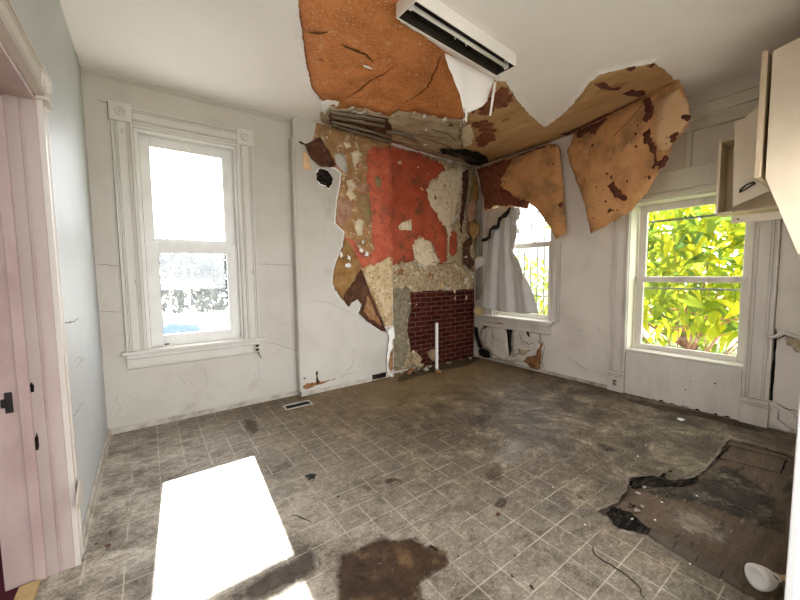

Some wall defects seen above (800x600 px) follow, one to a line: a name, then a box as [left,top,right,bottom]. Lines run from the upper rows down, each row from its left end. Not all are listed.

peeling [290,0,468,122]
spalling [313,123,490,380]